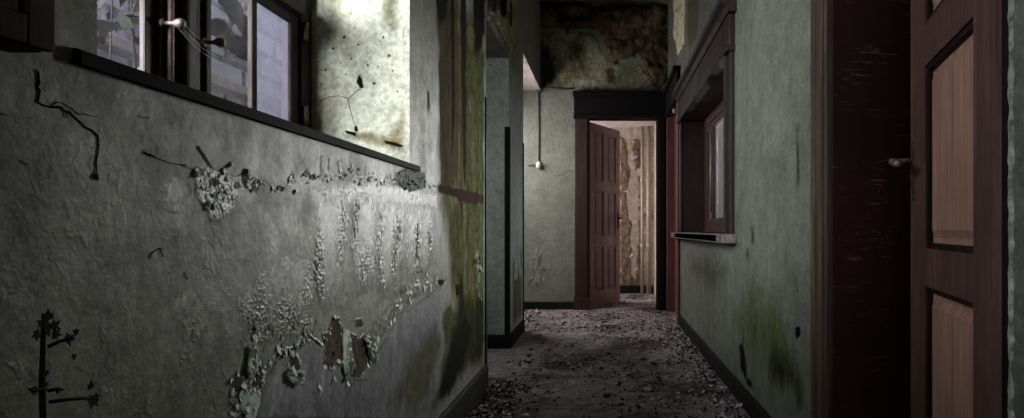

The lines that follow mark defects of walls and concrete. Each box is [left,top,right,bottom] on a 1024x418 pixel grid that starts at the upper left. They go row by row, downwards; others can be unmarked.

spalling [540,0,685,89]
crack [35,69,100,181]
crack [142,151,194,170]
peeling [198,161,438,194]
crack [314,88,361,125]
water stain [427,0,512,397]
flaking render [620,136,646,285]
peeling [230,269,448,418]
water stain [739,338,752,387]